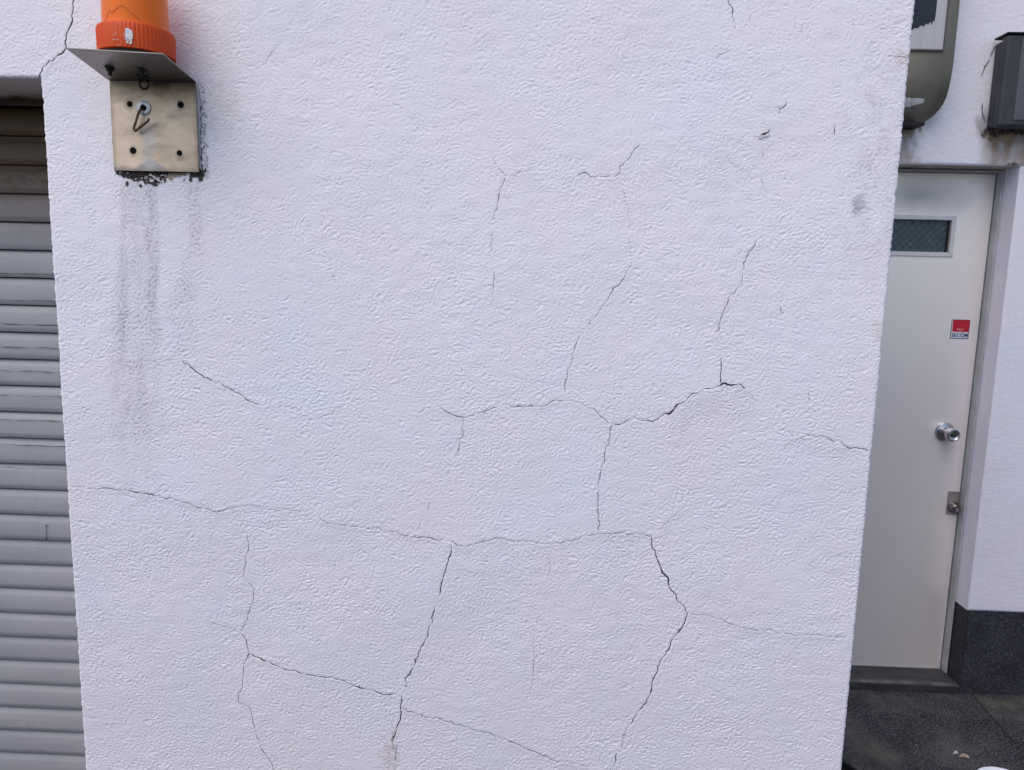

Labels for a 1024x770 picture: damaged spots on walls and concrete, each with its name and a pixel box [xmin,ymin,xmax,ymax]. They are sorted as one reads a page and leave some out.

crack [38,0,74,79]
crack [784,430,868,451]
crack [94,243,841,770]